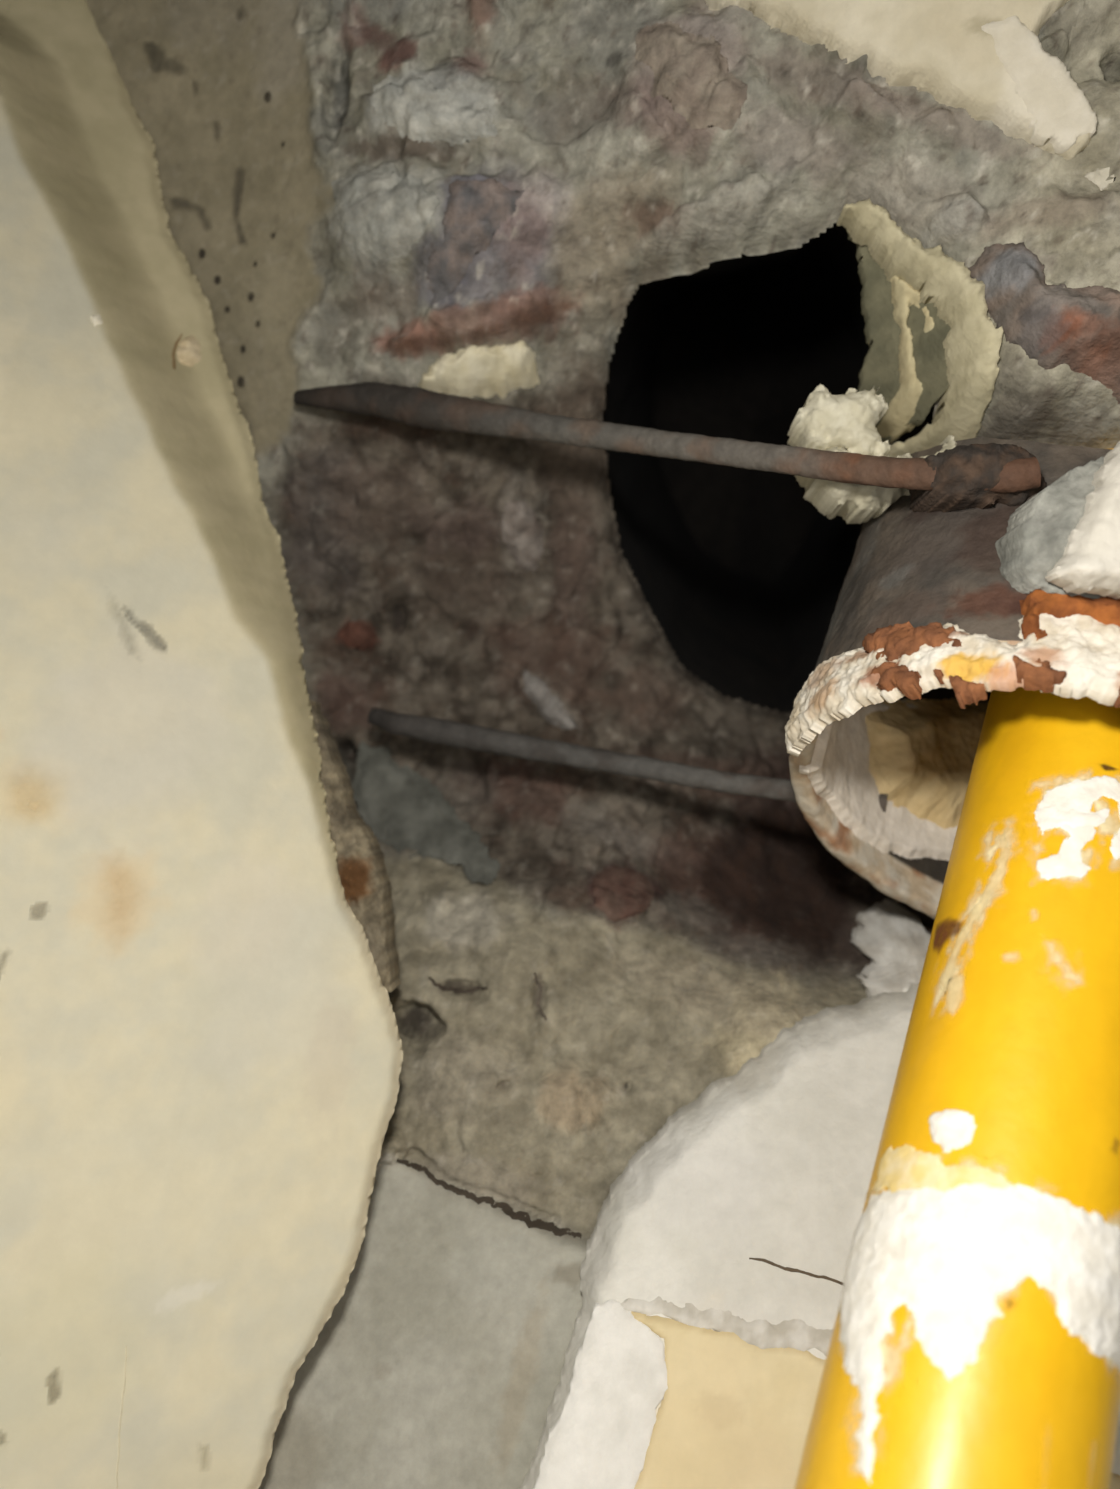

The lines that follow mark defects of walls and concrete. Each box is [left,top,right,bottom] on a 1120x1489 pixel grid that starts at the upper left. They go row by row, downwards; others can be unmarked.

spalling [256,0,1120,992]
rust [862,621,987,709]
rust [1012,589,1120,693]
crack [396,1159,582,1239]
peeling [533,1296,833,1489]